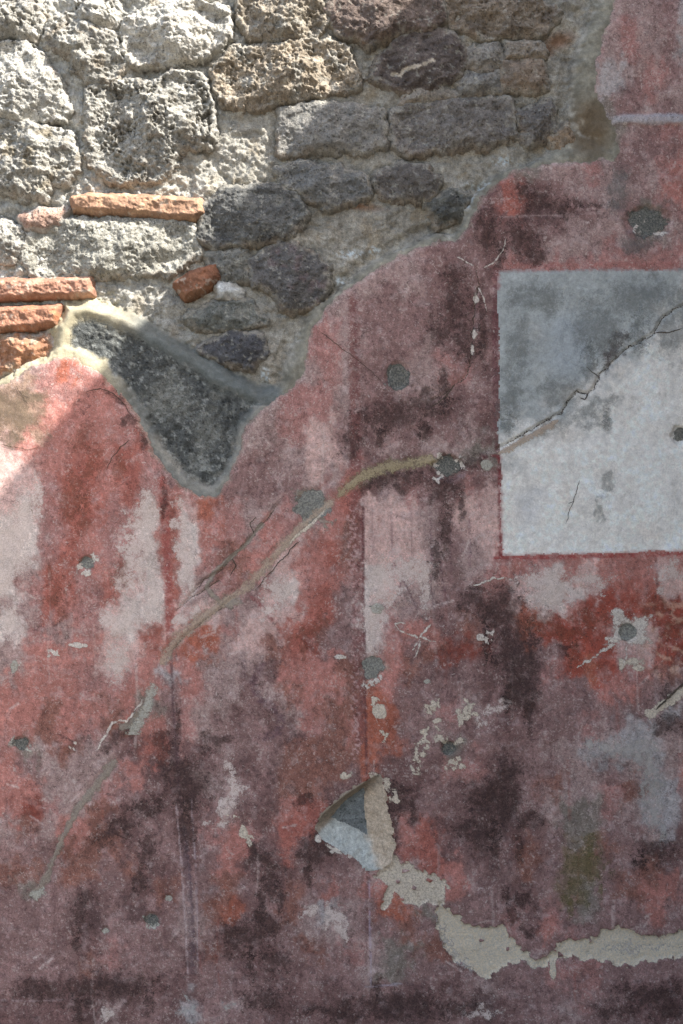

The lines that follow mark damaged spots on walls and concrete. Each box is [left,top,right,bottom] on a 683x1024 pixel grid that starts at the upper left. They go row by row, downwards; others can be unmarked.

crack [497,307,682,455]
spalling [429,452,468,484]
crack [126,454,438,735]
water stain [358,470,465,656]
water stain [458,565,618,729]
crack [30,759,118,901]
water stain [388,784,417,838]
spalling [410,697,479,775]
water stain [452,757,544,862]
spalling [315,772,683,980]